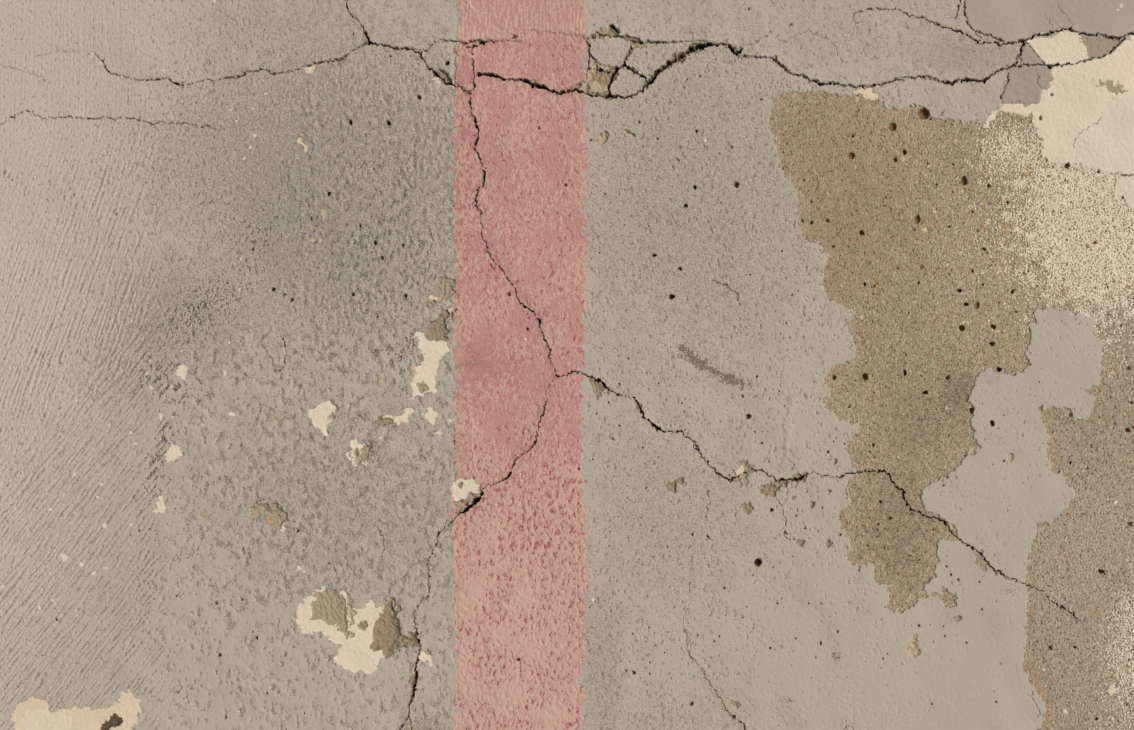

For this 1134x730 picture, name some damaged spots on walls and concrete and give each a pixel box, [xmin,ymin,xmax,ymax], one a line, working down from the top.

crack [33,50,190,86]
crack [200,48,359,82]
crack [67,116,267,132]
peeling [375,332,457,437]
crack [344,0,1134,730]
peeling [768,42,1134,730]
peeling [451,478,484,514]
peeling [296,586,434,675]
peeling [11,689,142,730]